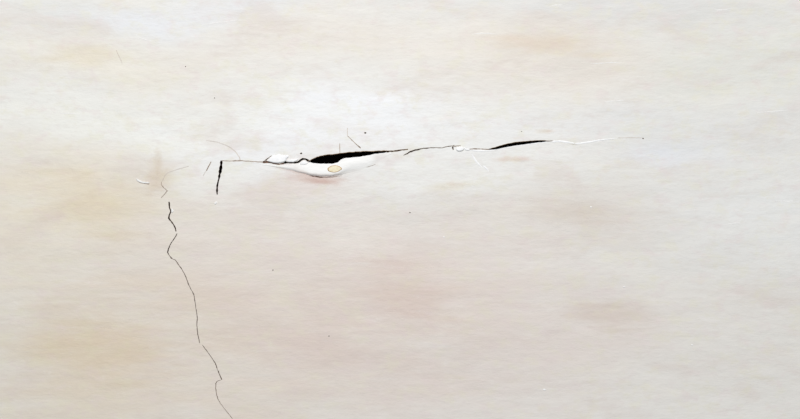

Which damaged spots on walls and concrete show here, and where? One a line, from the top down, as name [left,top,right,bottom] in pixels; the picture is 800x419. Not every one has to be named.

crack [161,128,553,419]